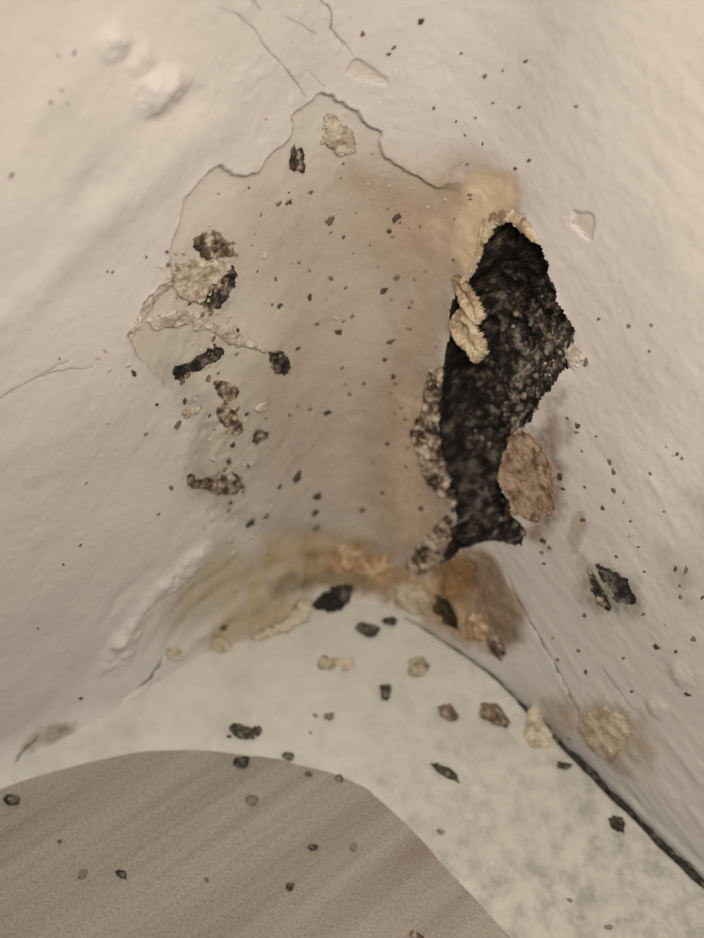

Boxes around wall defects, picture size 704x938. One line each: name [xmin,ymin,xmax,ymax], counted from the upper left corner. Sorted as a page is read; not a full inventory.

crack [217,0,326,93]
crack [288,0,353,55]
leakage [383,167,517,283]
peeling [572,211,595,239]
crack [1,361,92,398]
peeling [126,93,585,662]
leakage [371,300,442,554]
leakage [541,420,565,504]
leakage [176,492,367,637]
leakage [530,518,551,565]